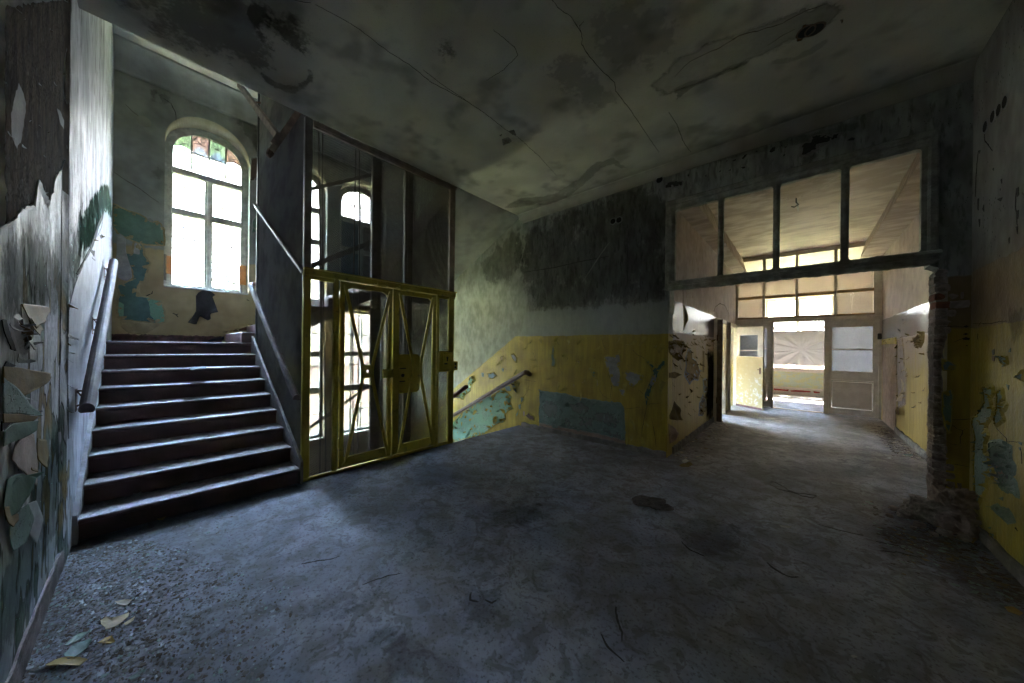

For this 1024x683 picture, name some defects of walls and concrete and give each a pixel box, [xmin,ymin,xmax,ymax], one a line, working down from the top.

spalling [0,0,67,229]
crack [295,0,557,176]
peeling [77,203,166,335]
peeling [453,353,535,442]
spalling [604,305,716,420]
spalling [882,268,1024,531]